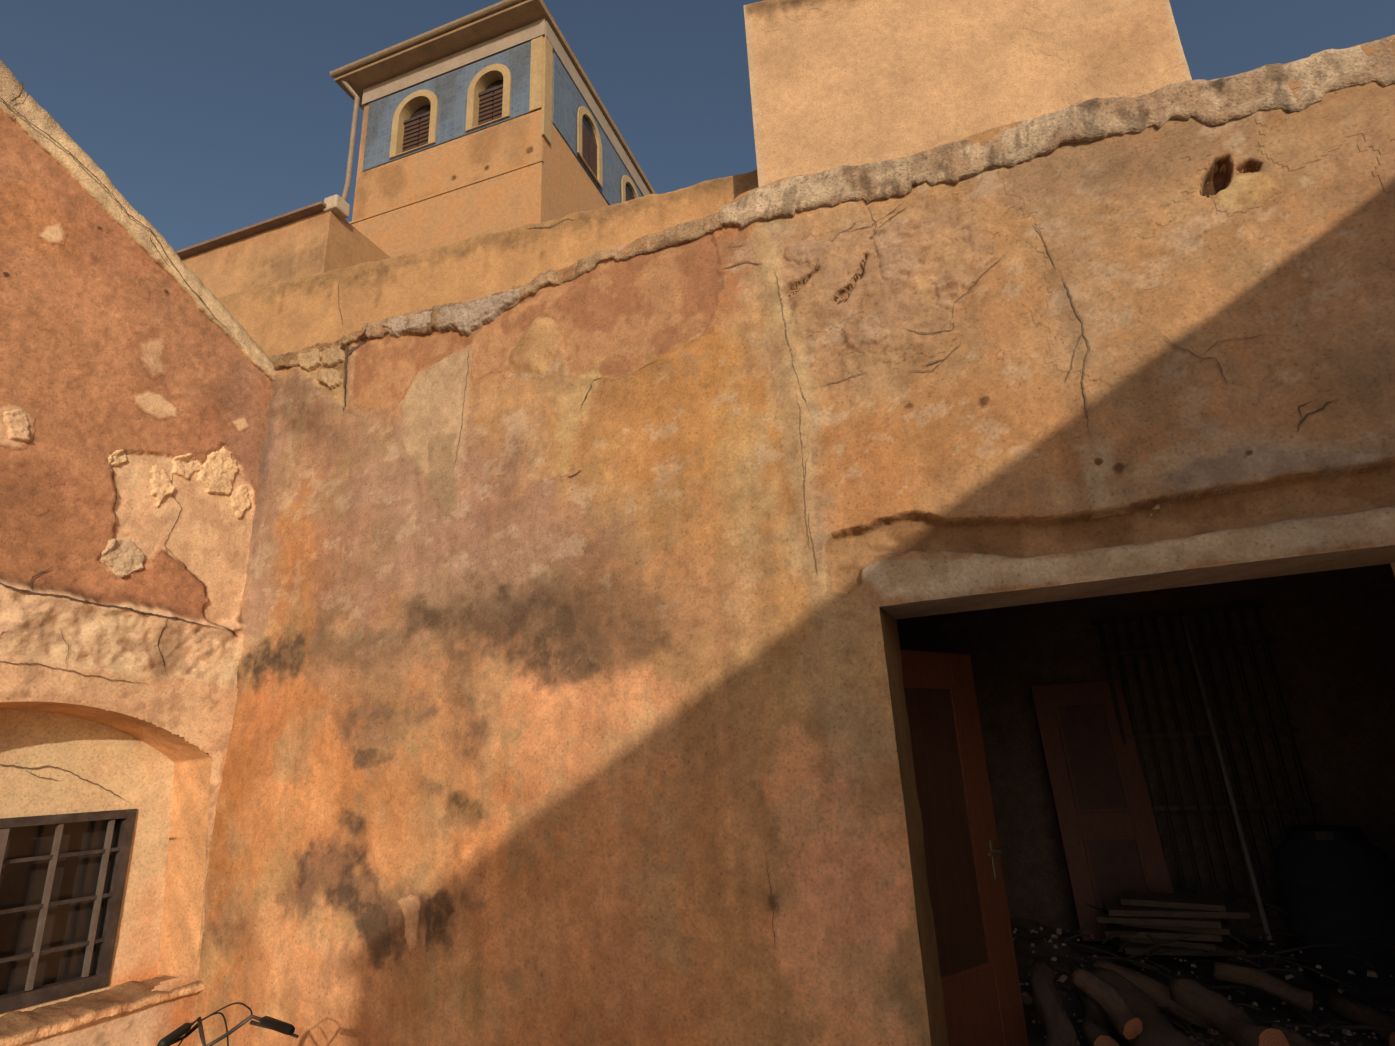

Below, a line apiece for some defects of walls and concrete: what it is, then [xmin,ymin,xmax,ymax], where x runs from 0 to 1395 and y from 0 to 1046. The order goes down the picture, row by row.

spalling [0,402,36,451]
crack [0,764,132,805]
crack [0,568,237,684]
crack [0,80,240,344]
spalling [132,335,179,421]
spalling [97,415,256,630]
water stain [236,540,692,846]
crack [721,243,868,576]
crack [815,204,905,272]
crack [1031,219,1092,441]
peeling [1213,156,1281,216]
water stain [201,798,496,1021]